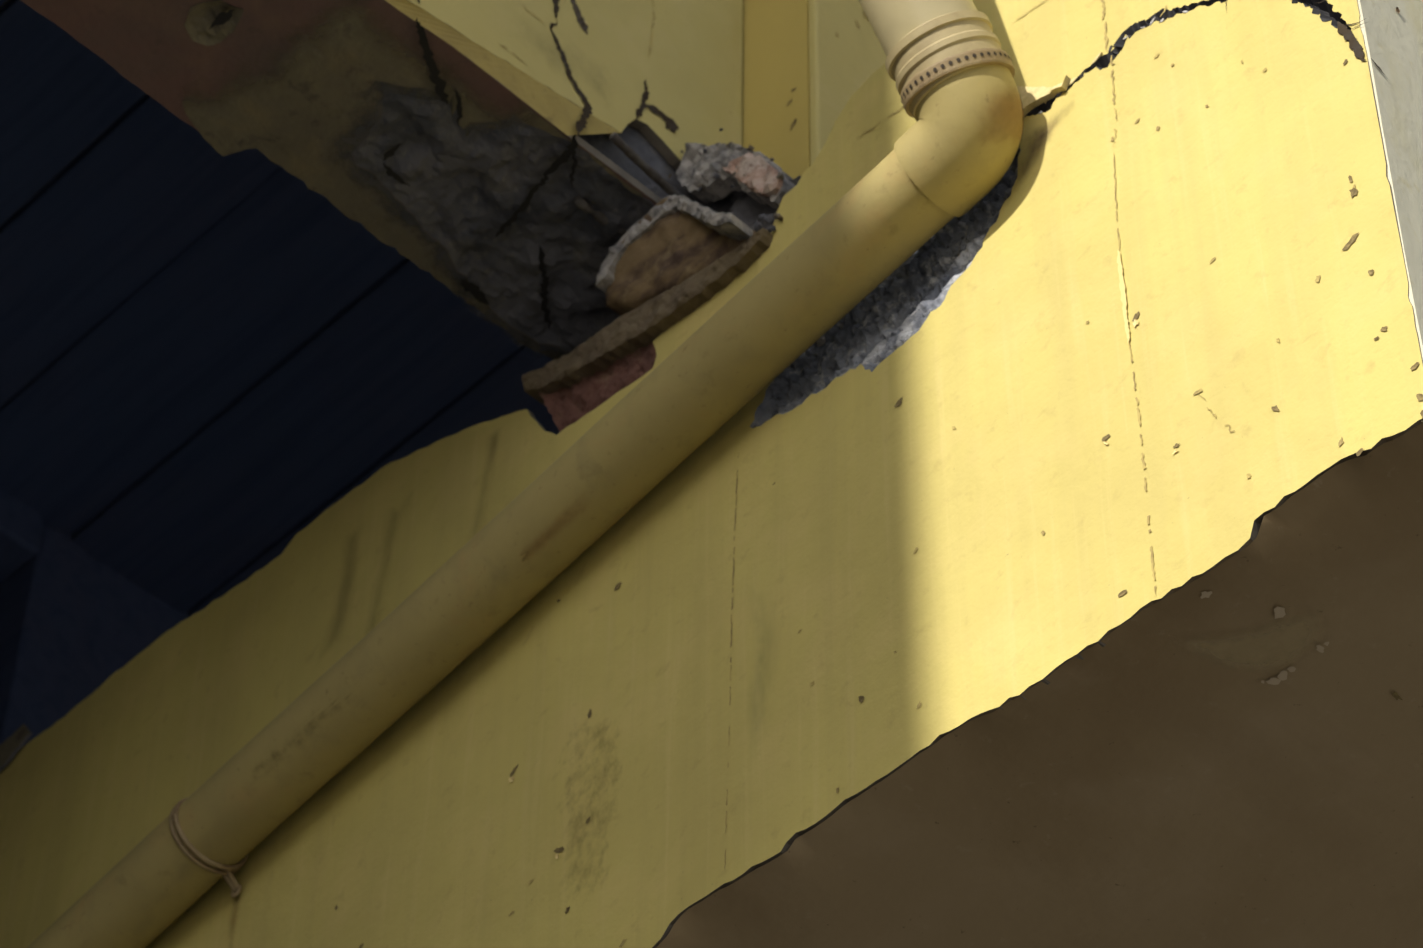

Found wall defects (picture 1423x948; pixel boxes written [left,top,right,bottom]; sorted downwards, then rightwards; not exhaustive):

crack [382,144,409,186]
crack [415,18,463,127]
crack [495,0,592,237]
crack [636,0,679,133]
crack [1292,0,1388,79]
crack [460,279,490,305]
crack [538,246,552,330]
spalling [335,81,801,432]
spalling [750,147,1021,429]
crack [1024,0,1227,594]